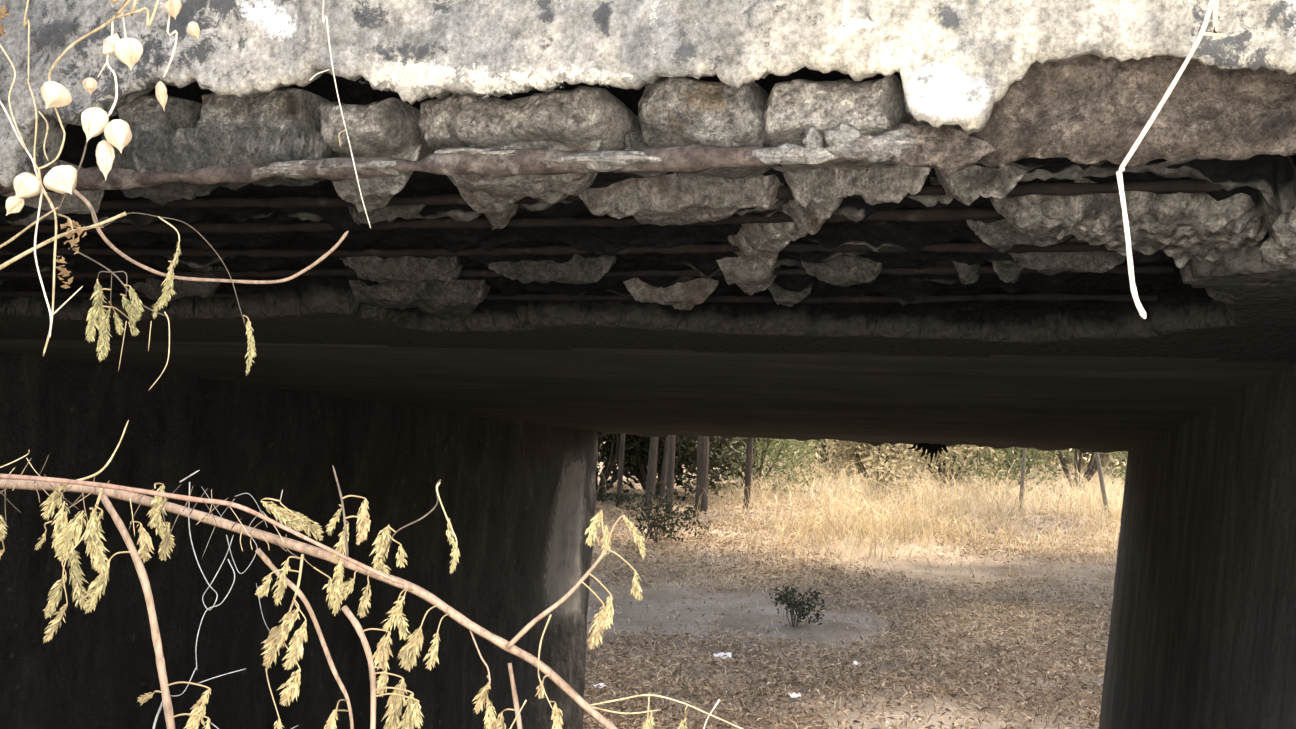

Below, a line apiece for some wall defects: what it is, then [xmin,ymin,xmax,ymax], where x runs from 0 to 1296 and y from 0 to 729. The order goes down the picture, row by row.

spalling [0,54,1296,320]